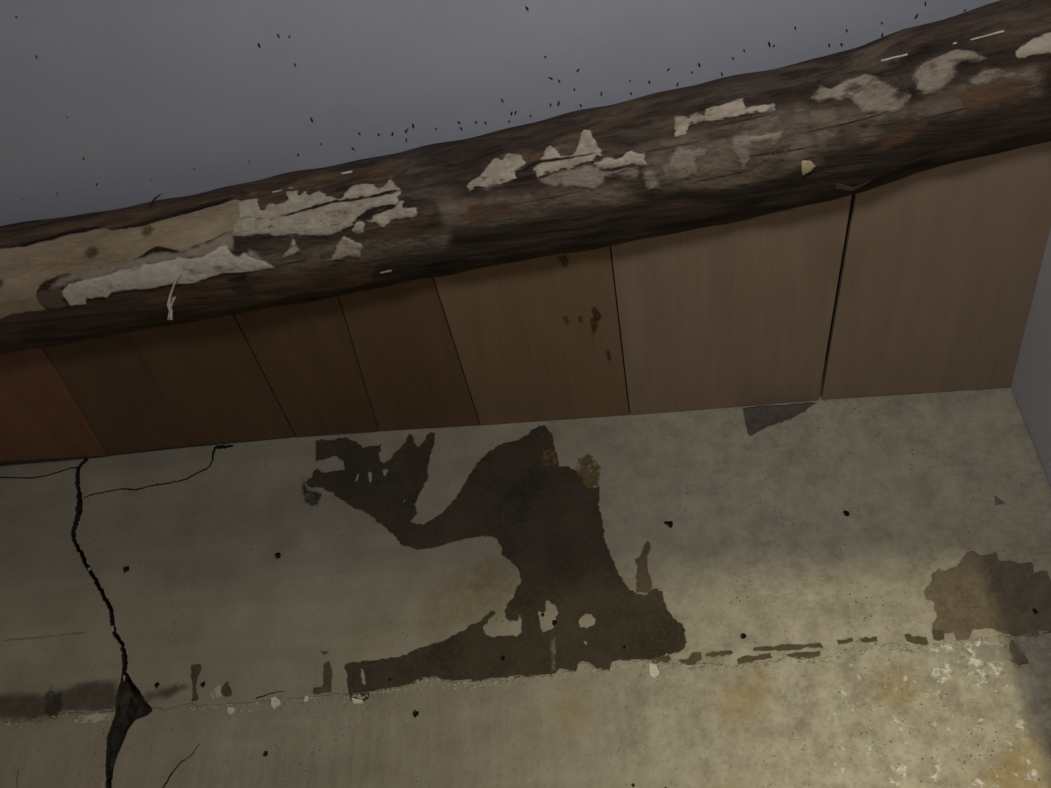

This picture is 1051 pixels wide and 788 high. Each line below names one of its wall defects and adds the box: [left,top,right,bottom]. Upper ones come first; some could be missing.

peeling [1015,32,1051,58]
peeling [812,49,1016,113]
peeling [467,98,775,191]
peeling [730,131,783,169]
peeling [802,160,815,175]
peeling [231,179,418,264]
spalling [743,402,816,436]
water stain [303,425,686,701]
crack [0,444,234,788]
water stain [922,551,1051,706]
water stain [0,682,116,719]